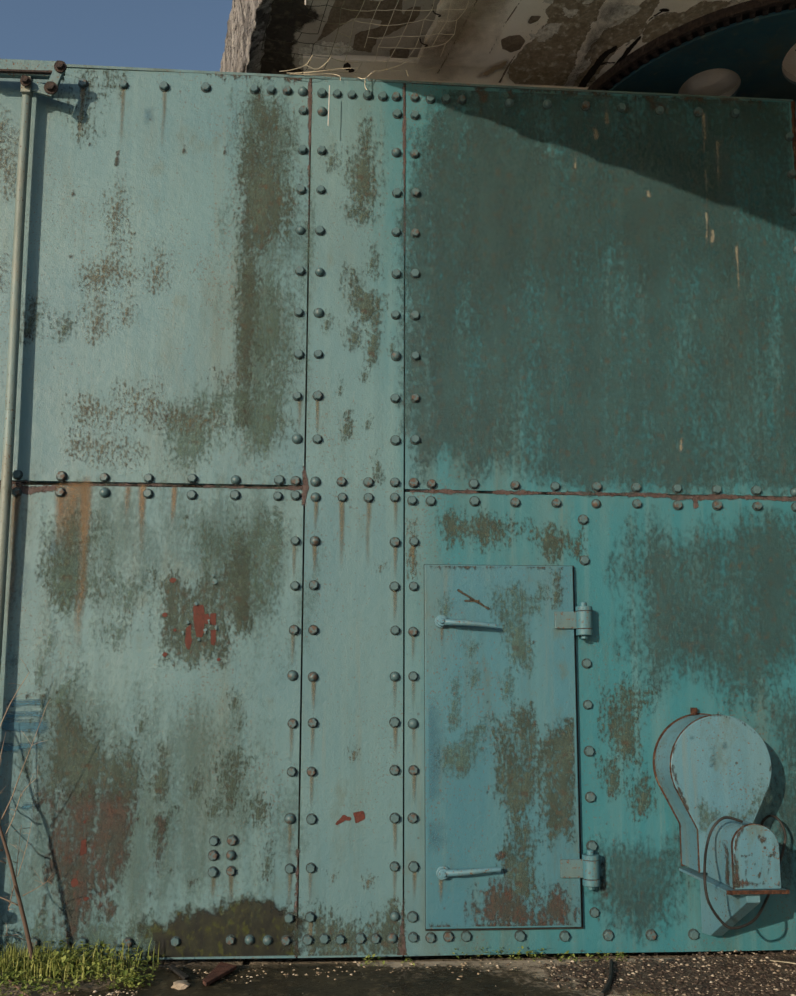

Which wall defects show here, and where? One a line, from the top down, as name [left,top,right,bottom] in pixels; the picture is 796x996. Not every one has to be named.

spalling [475,0,761,114]
rust [58,483,90,536]
rust [31,778,138,946]
water stain [0,899,608,996]
rust [464,879,579,927]